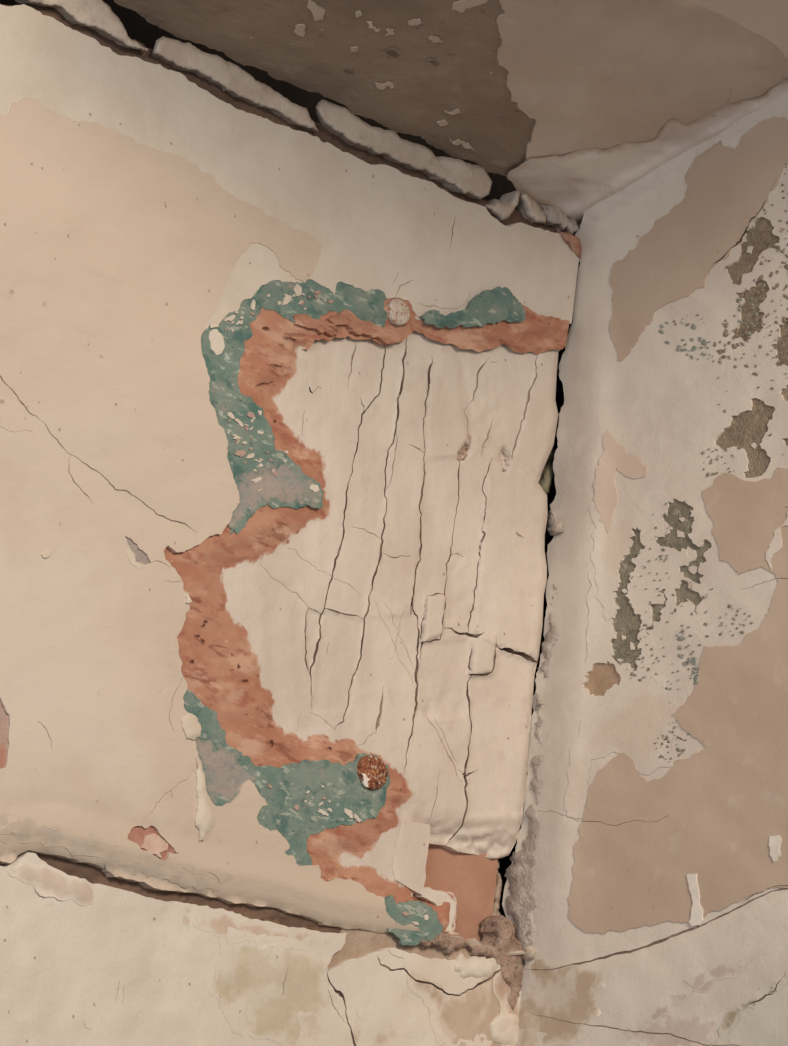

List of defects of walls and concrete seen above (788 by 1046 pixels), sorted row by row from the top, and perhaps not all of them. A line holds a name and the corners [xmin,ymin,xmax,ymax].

peeling [609,116,788,366]
crack [0,376,197,532]
peeling [0,0,580,968]
crack [297,338,539,845]
leakage [588,501,651,621]
peeling [568,386,788,934]
crack [326,968,356,1046]
crack [377,950,500,996]
crack [527,885,788,971]
crack [749,971,786,1004]